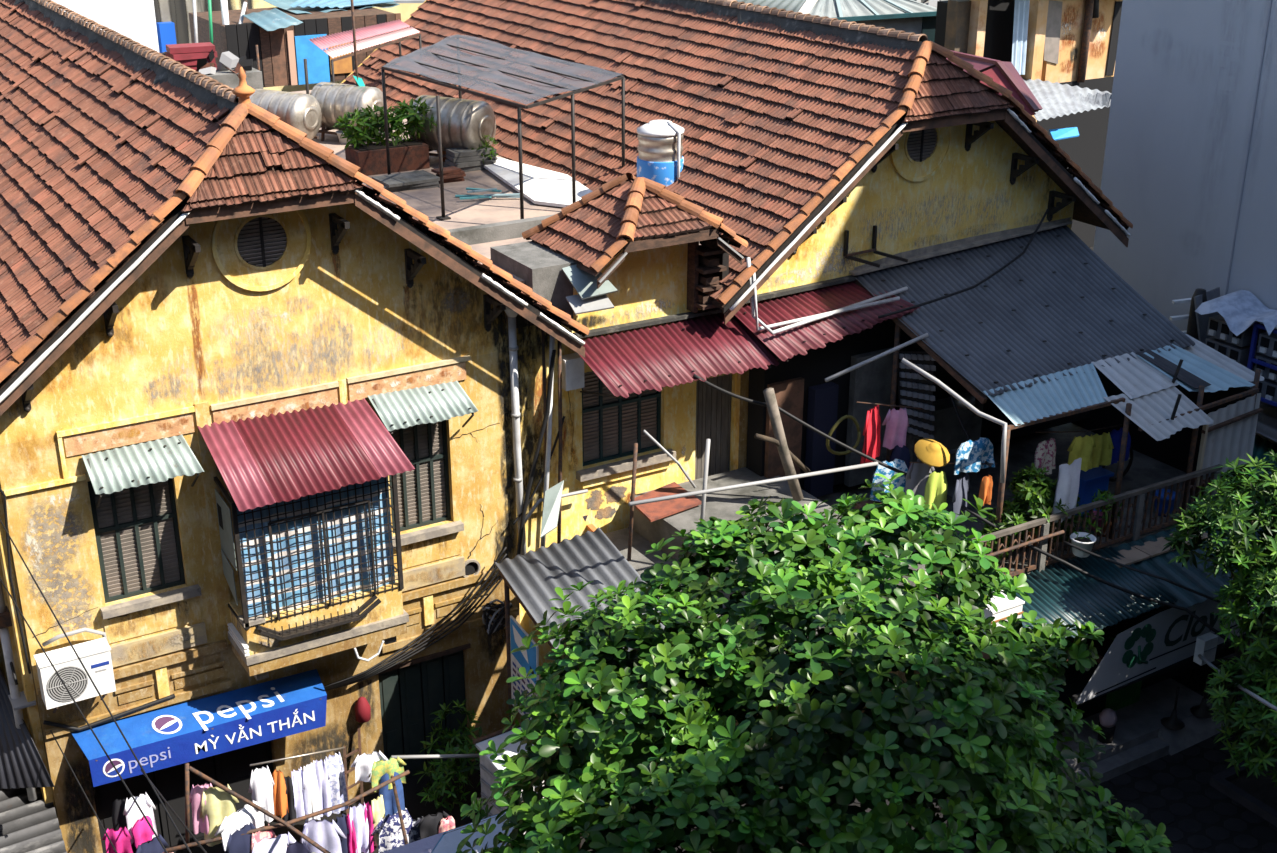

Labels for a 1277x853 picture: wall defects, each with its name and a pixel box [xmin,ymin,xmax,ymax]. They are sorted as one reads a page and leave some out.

rust [188,284,202,383]
damp [151,311,345,397]
damp [414,276,550,561]
flaking render [585,486,631,519]
peeling [26,495,92,632]